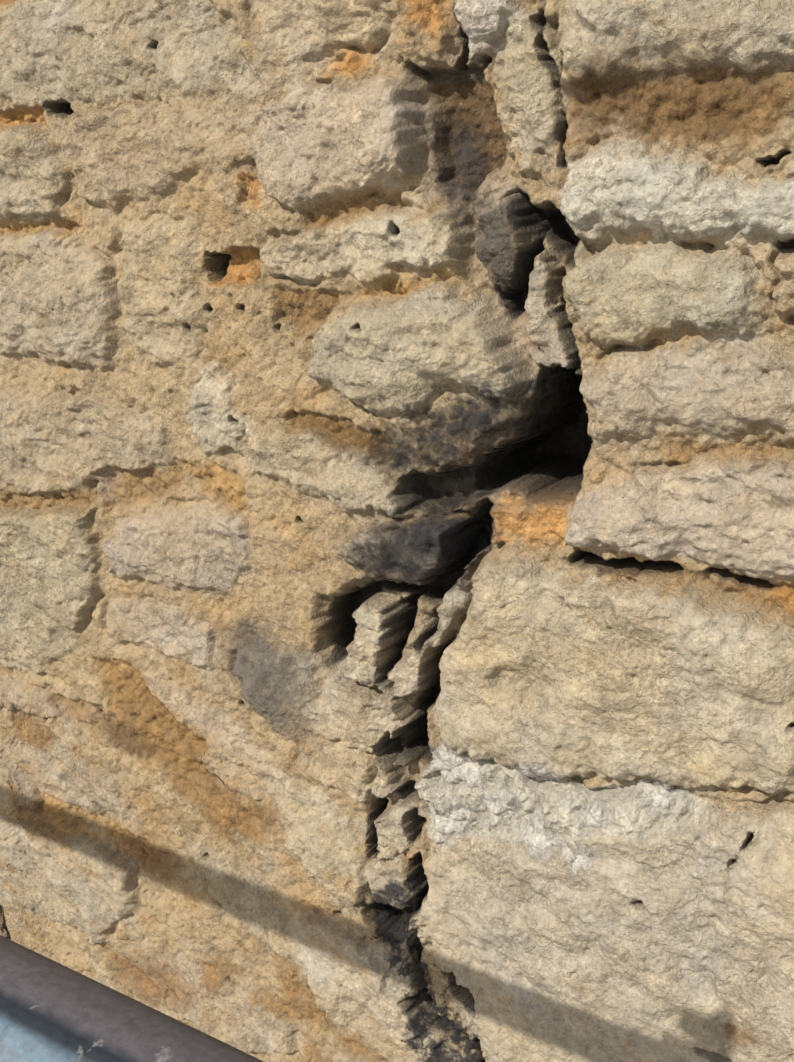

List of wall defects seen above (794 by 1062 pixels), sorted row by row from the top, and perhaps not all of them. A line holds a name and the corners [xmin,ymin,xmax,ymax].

crack [396,0,492,90]
crack [319,187,594,1062]
leakage [363,876,486,1062]